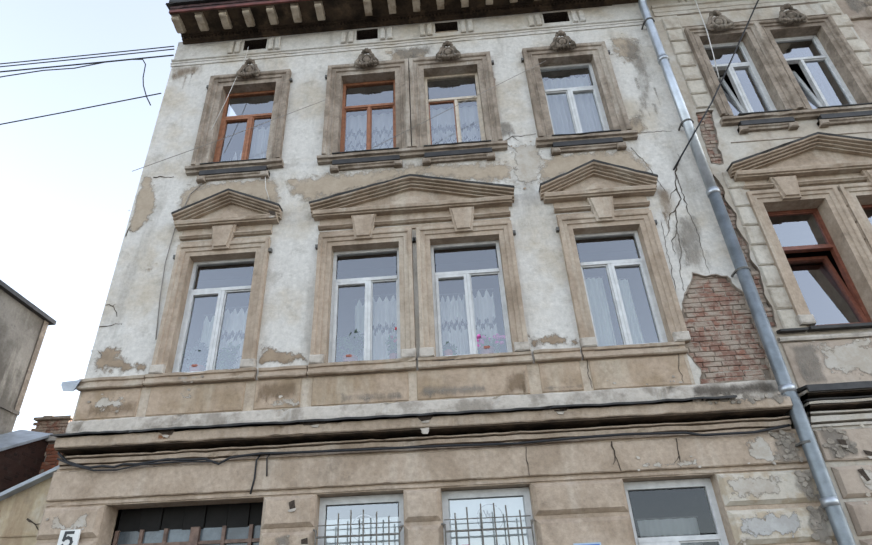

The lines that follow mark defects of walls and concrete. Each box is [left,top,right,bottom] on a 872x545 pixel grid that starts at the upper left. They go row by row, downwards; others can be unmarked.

peeling [128,176,155,232]
crack [631,131,710,290]
spalling [696,110,777,328]
peeling [91,347,146,373]
peeling [258,342,305,365]
spalling [682,272,775,384]
peeling [812,337,872,376]
spalling [693,392,787,405]
peeling [740,430,832,545]
spalling [821,426,872,497]